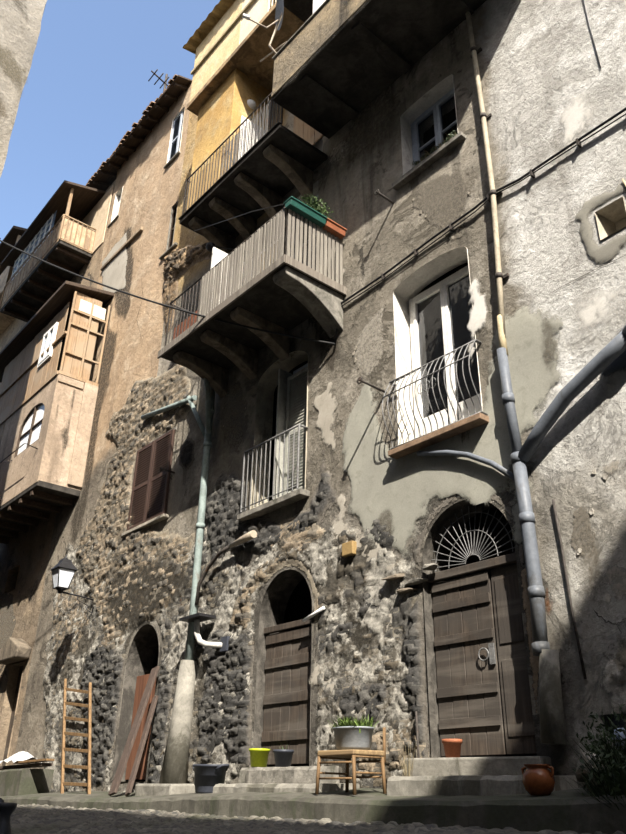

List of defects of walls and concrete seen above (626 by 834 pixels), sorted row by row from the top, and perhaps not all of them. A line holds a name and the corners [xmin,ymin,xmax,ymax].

peeling [412,172,471,241]
spalling [179,437,195,472]
flaking render [43,496,459,793]